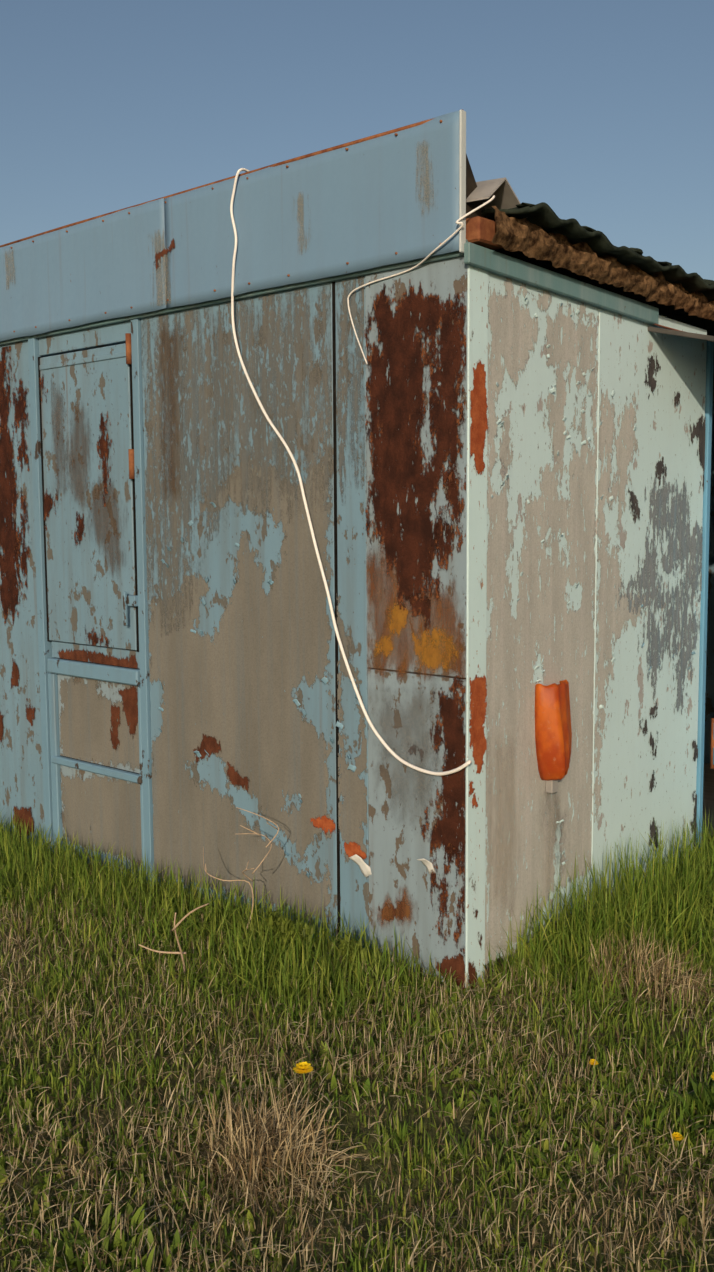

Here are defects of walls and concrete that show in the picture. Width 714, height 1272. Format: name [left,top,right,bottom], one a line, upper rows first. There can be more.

rust [0,346,120,624]
rust [57,628,138,669]
rust [110,686,138,750]
peeling [59,453,372,924]
rust [193,734,250,792]
rust [364,279,488,990]
peeling [417,858,436,874]
peeling [485,278,706,968]